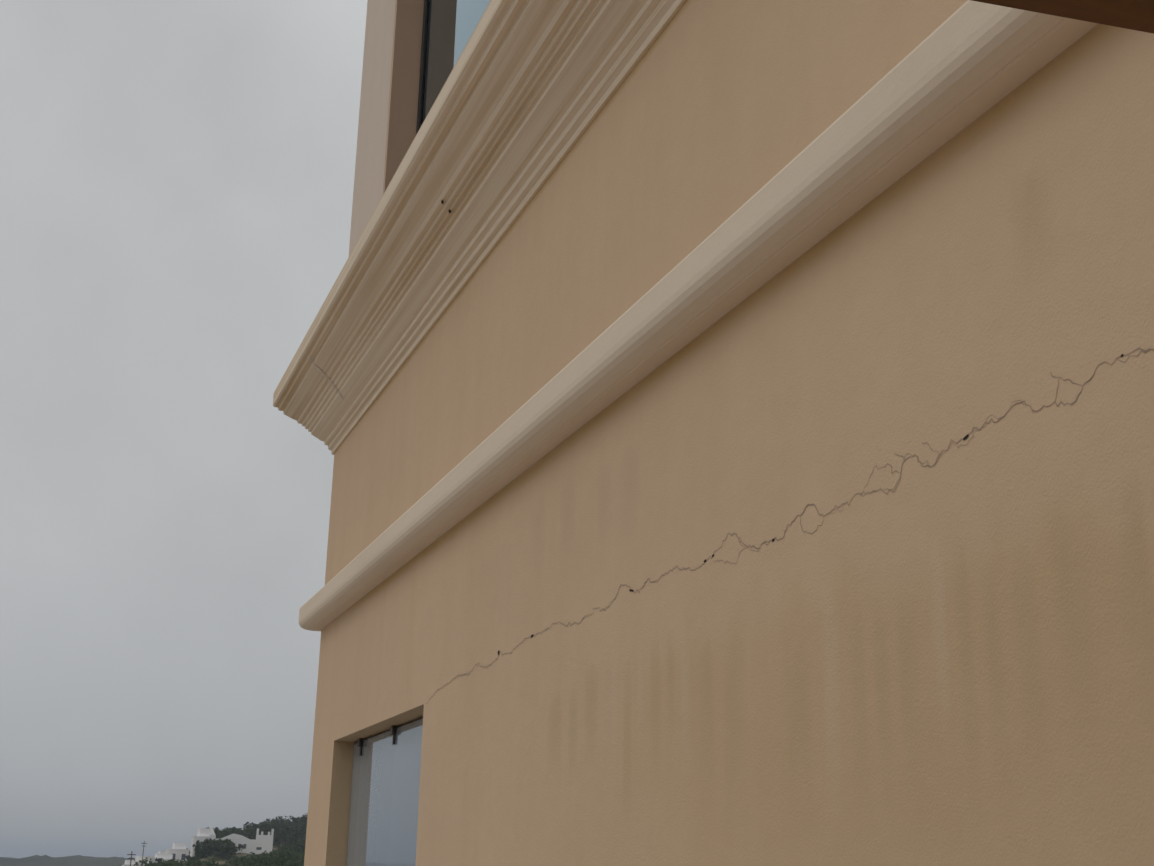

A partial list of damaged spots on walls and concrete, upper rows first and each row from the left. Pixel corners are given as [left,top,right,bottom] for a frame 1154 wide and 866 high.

crack [426,348,1154,704]
leakage [519,388,1154,866]